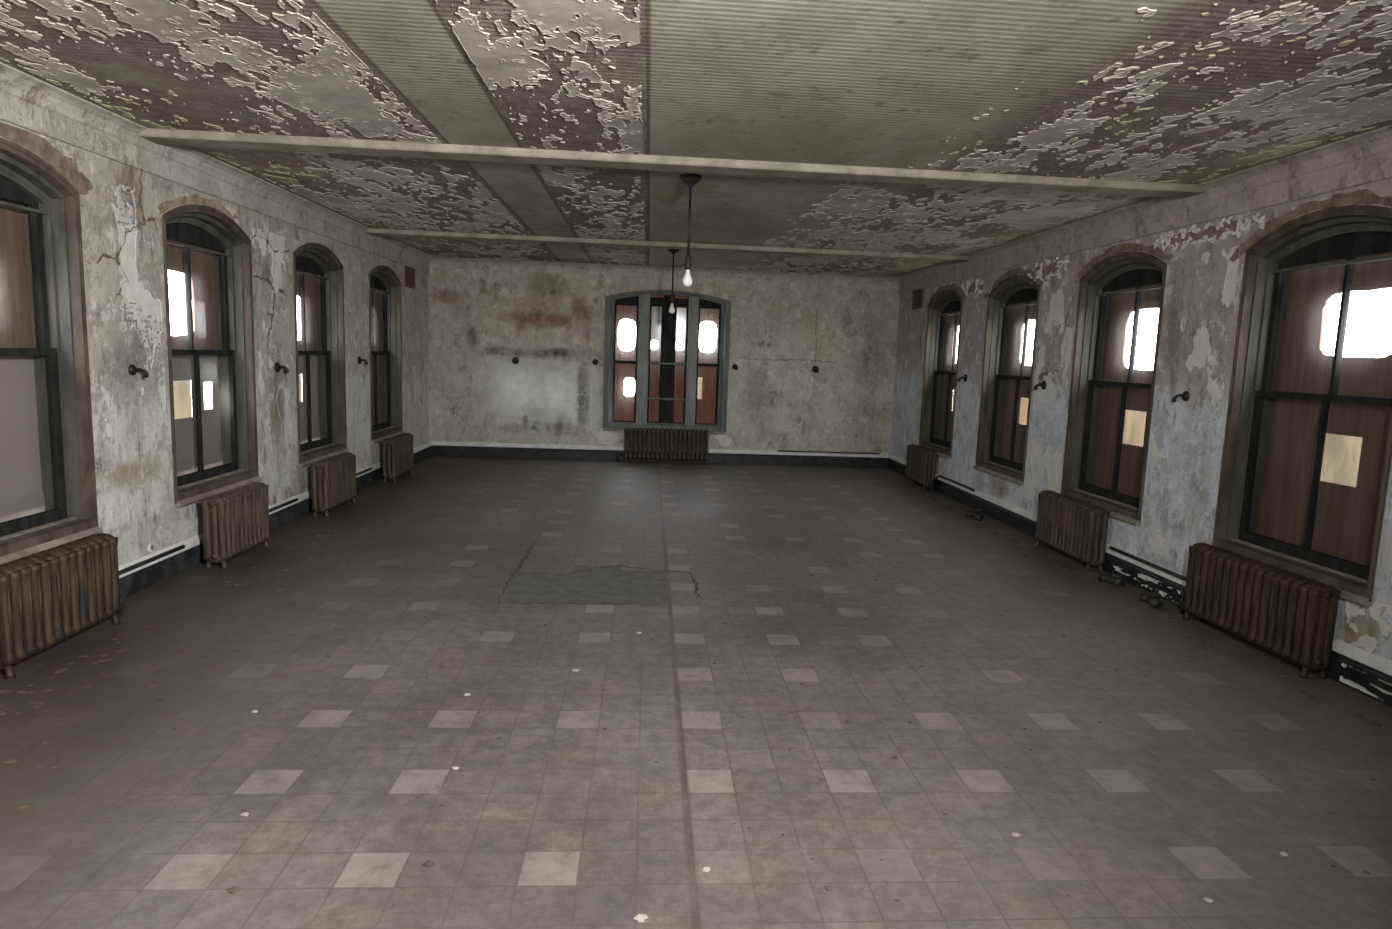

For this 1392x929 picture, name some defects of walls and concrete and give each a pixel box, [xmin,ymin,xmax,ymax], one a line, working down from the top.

peeling [0,0,555,261]
peeling [435,0,645,265]
peeling [737,0,1392,277]